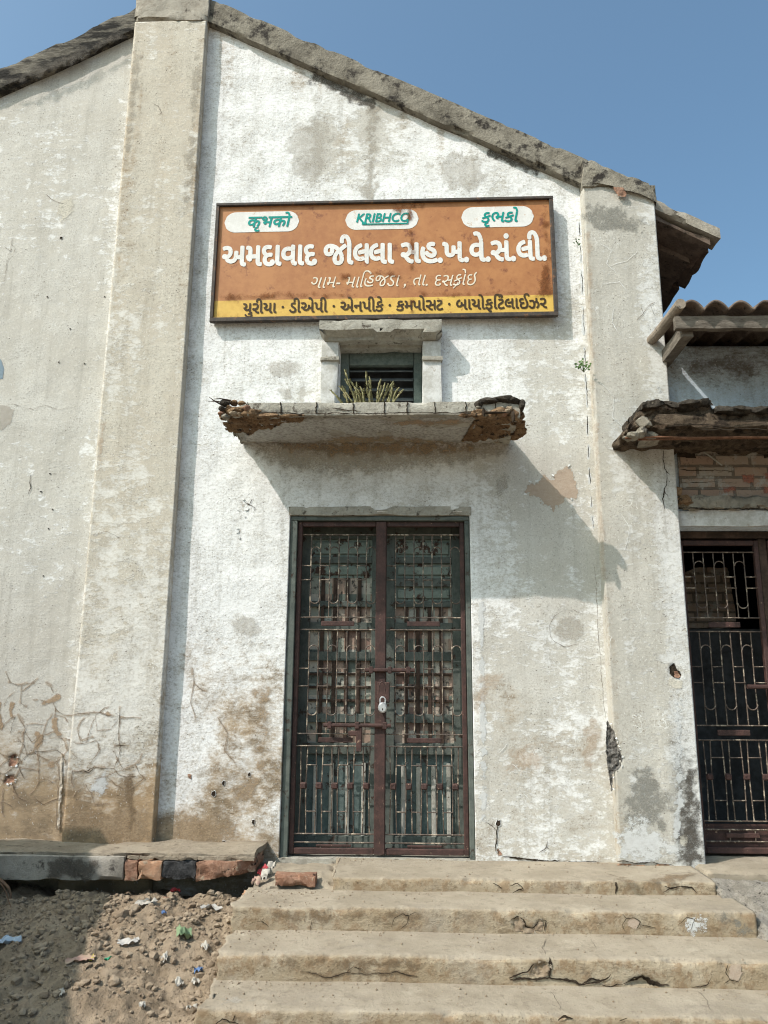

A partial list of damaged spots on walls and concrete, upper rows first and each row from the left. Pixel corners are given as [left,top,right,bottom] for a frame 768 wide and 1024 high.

damp [307,71,380,199]
damp [487,149,539,176]
spalling [208,397,312,436]
spalling [458,395,528,443]
flaking render [622,413,768,506]
crack [662,451,768,510]
crack [0,676,145,829]
damp [233,746,264,811]
spalling [605,721,624,791]
damp [611,698,704,866]
crack [486,820,696,1021]
crack [301,967,417,978]